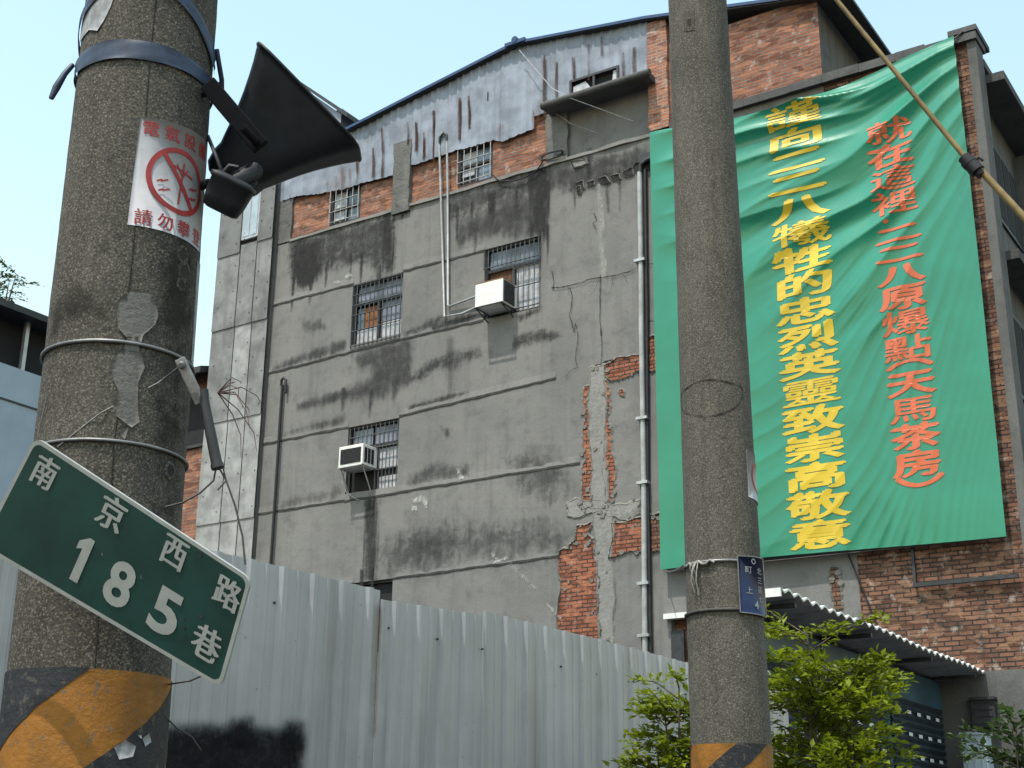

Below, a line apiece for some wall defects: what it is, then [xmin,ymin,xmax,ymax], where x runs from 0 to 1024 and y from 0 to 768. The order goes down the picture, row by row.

rust [372,128,384,178]
rust [407,110,435,161]
rust [458,96,471,140]
water stain [449,148,640,251]
rust [542,56,558,117]
water stain [290,210,407,303]
crack [551,263,653,378]
water stain [298,314,475,427]
flaking render [555,334,660,643]